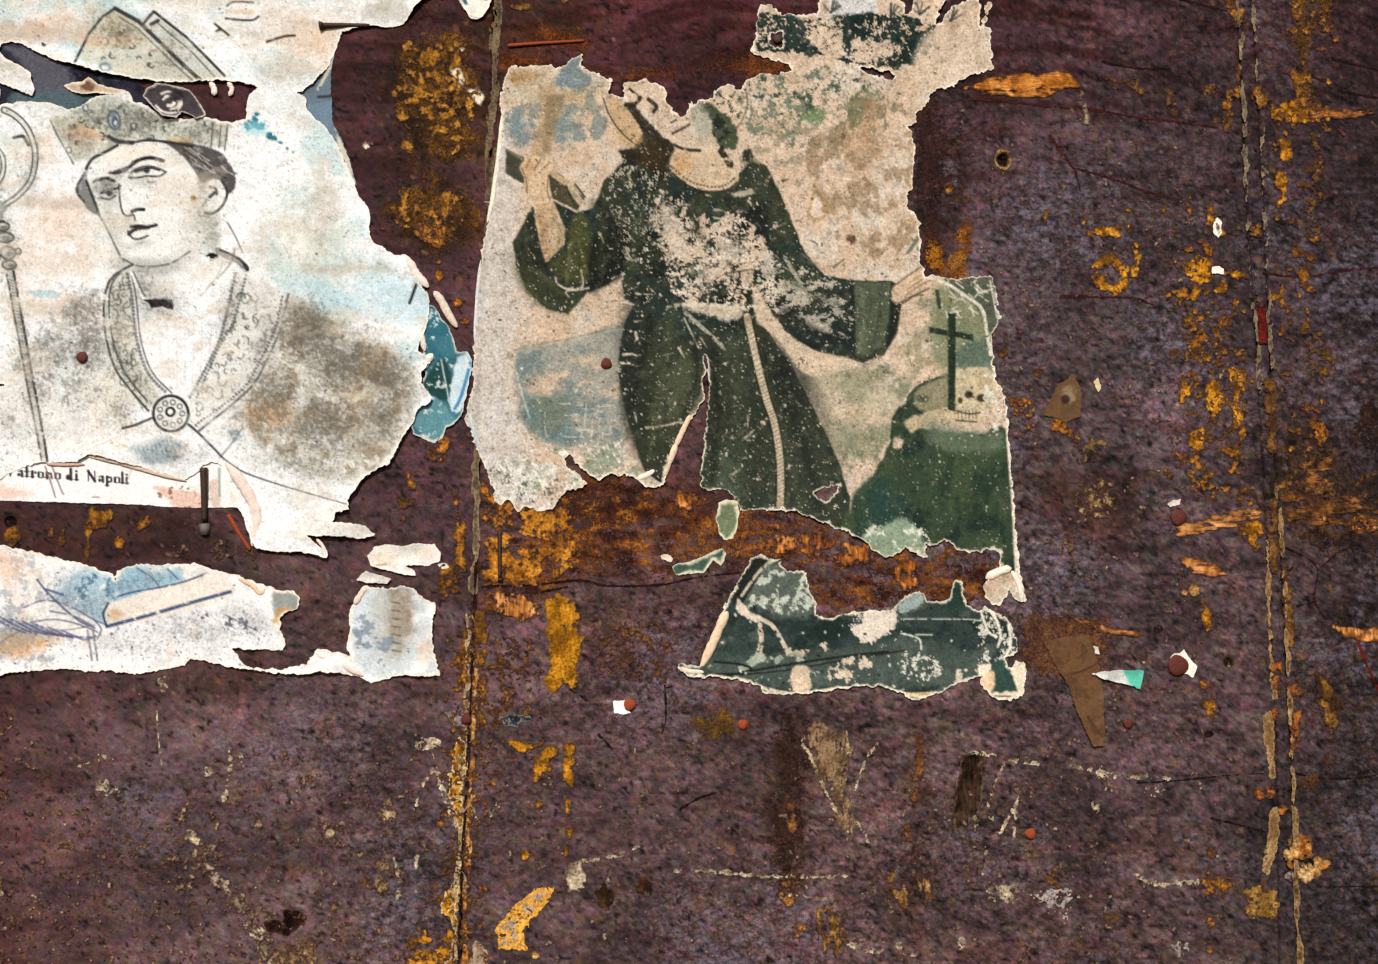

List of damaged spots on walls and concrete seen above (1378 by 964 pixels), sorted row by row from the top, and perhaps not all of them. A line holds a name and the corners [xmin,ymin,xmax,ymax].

corrosion [381,16,599,261]
corrosion [596,51,792,85]
corrosion [467,475,1014,622]
peeling [647,0,1378,964]